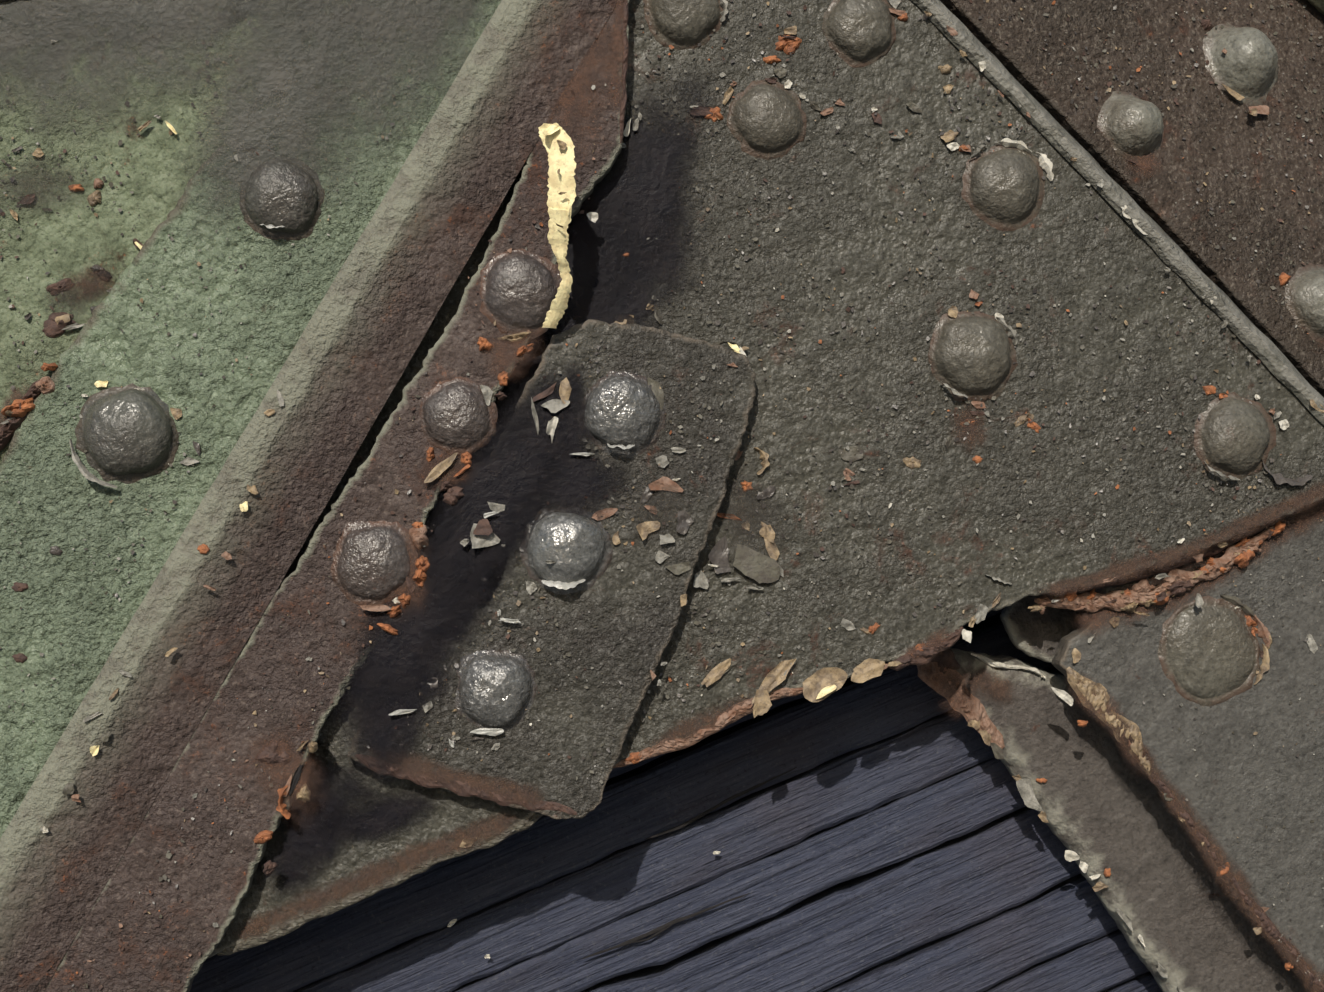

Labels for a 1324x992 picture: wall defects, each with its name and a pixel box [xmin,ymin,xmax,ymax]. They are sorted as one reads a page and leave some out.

rust [46,264,112,313]
rust [0,363,58,451]
rust [477,332,534,406]
rust [424,447,472,506]
rust [360,522,430,635]
rust [1028,484,1324,627]
rust [887,626,1008,749]